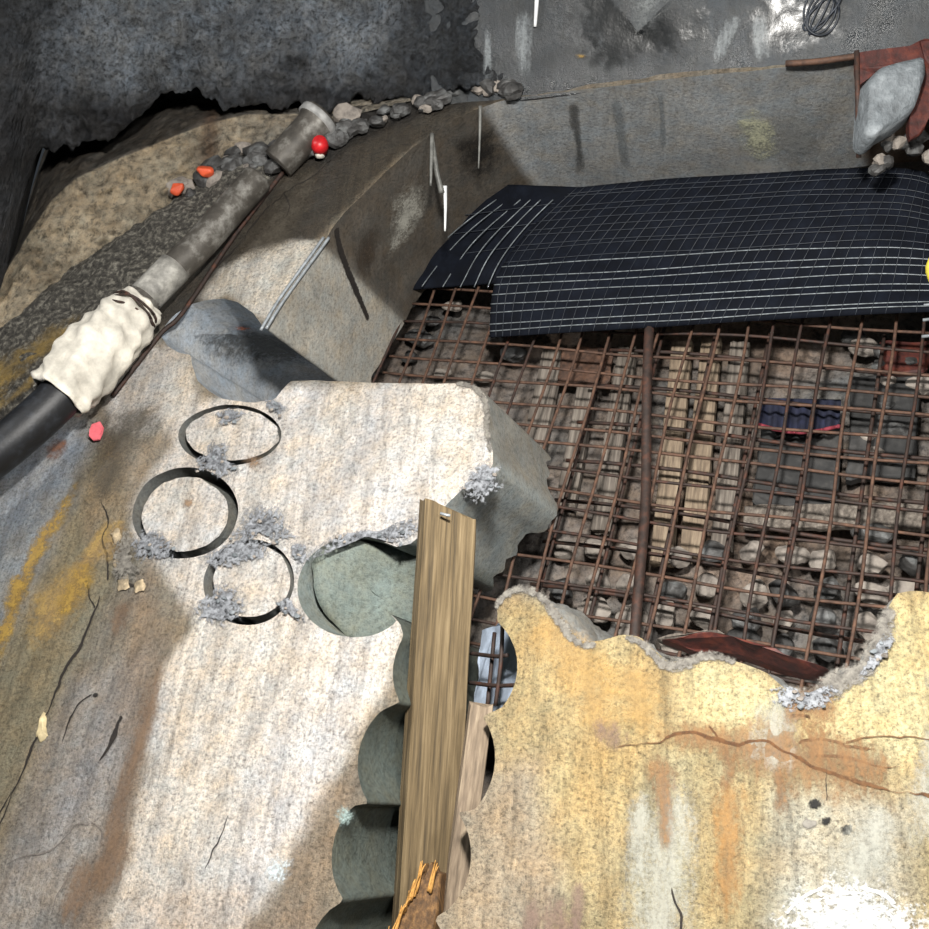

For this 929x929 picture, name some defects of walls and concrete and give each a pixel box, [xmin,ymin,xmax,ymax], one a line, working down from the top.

spalling [372,285,929,706]
crack [45,502,134,741]
crack [0,737,38,824]
crack [11,822,103,862]
crack [99,716,122,761]
corrosion [649,762,670,843]
crack [618,726,929,800]
corrosion [675,699,886,902]
crack [671,889,683,929]